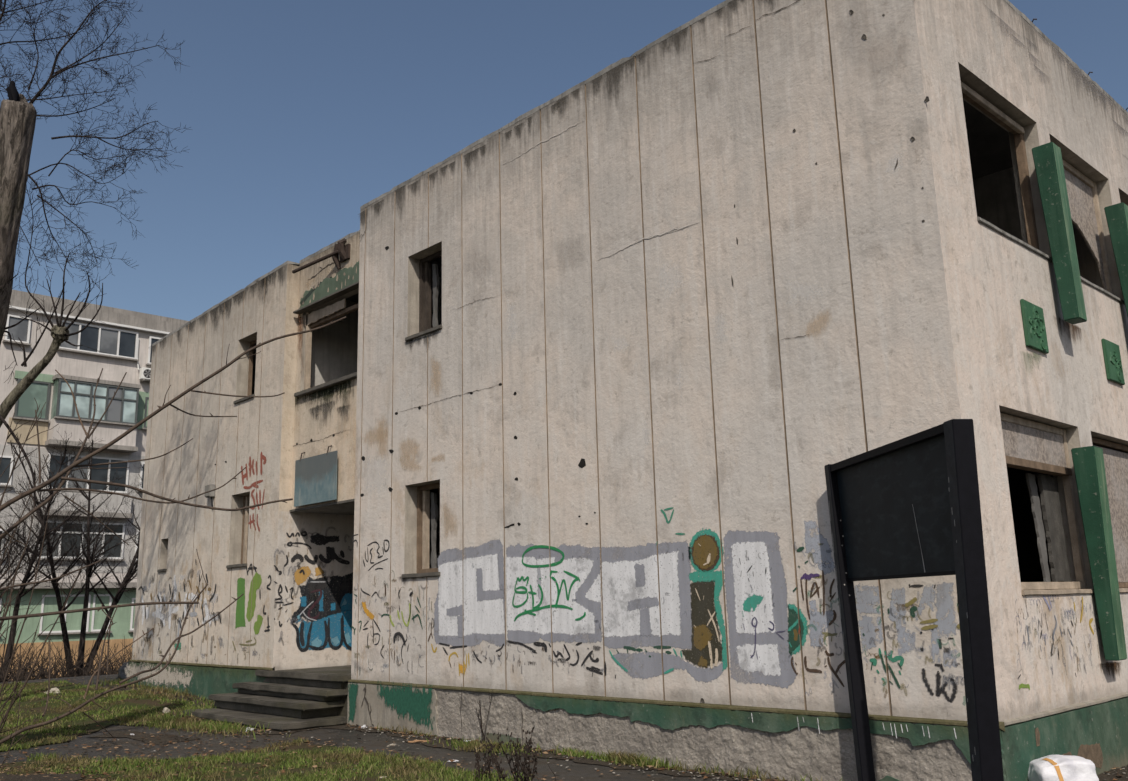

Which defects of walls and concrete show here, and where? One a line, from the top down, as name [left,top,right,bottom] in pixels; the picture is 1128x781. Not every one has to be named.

damp [591,51,645,93]
damp [552,89,579,111]
damp [295,380,351,419]
peeling [348,682,358,721]
spalling [377,682,858,781]
spalling [870,720,976,781]